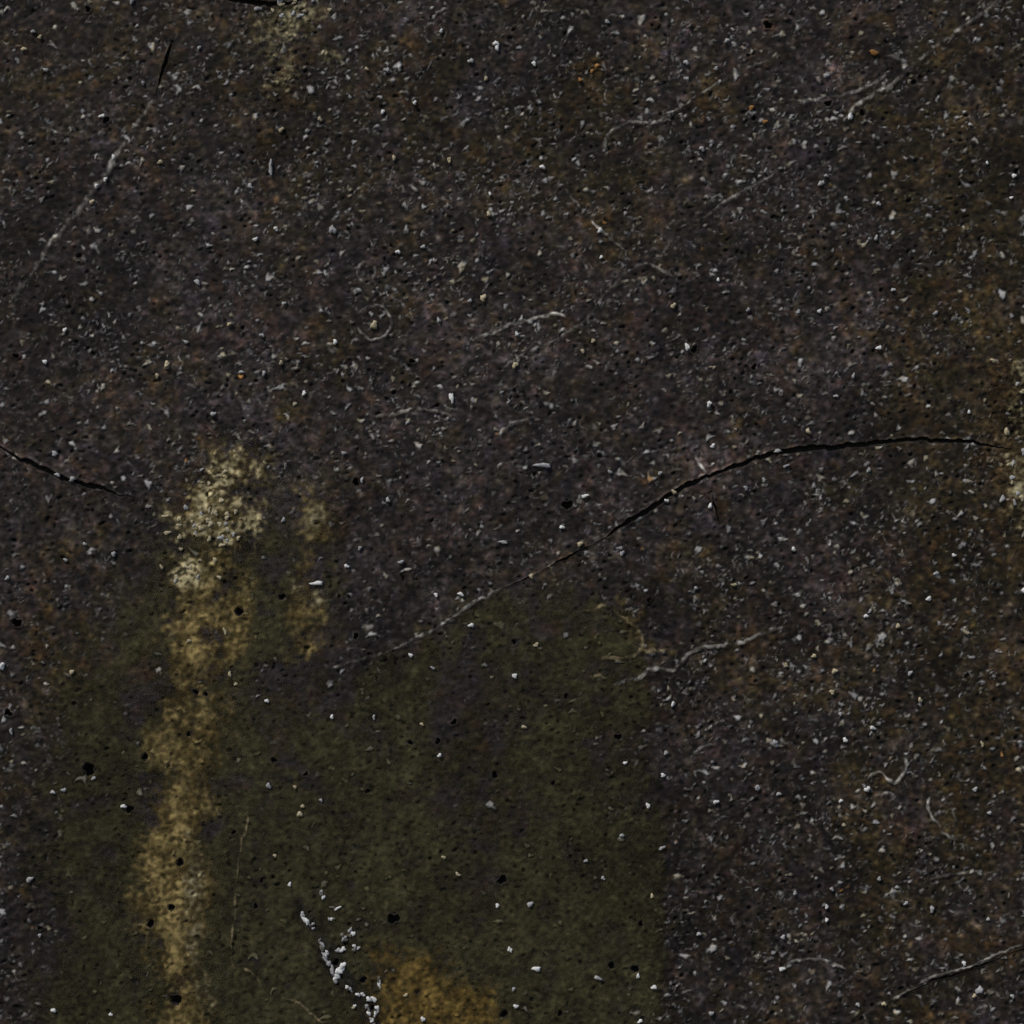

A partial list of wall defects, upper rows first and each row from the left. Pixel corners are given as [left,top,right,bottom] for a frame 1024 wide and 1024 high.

crack [0,443,135,500]
leakage [303,506,327,568]
crack [395,434,1011,649]
leakage [288,579,326,627]
crack [584,604,782,684]
leakage [136,446,270,1024]